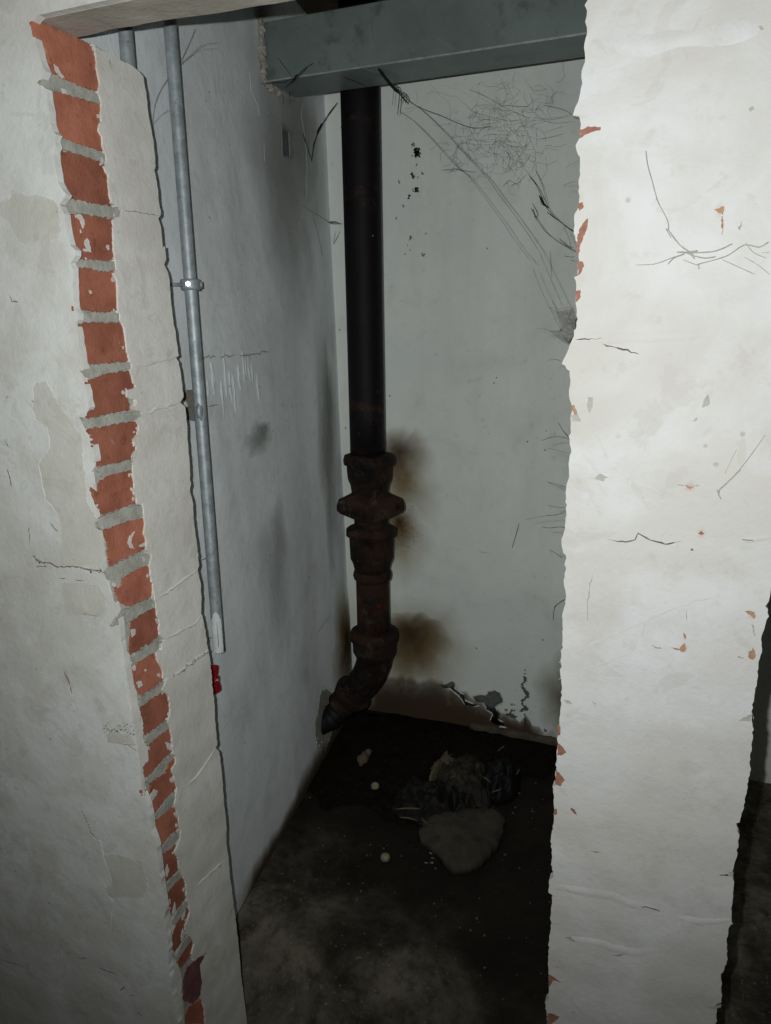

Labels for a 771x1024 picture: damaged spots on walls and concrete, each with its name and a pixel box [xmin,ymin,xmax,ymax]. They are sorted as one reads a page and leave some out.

rust [387,440,415,497]
flaking render [0,21,204,1024]
crack [608,533,680,545]
crack [31,555,104,581]
rust [339,616,352,668]
damp [366,678,542,735]
peeling [440,669,530,728]